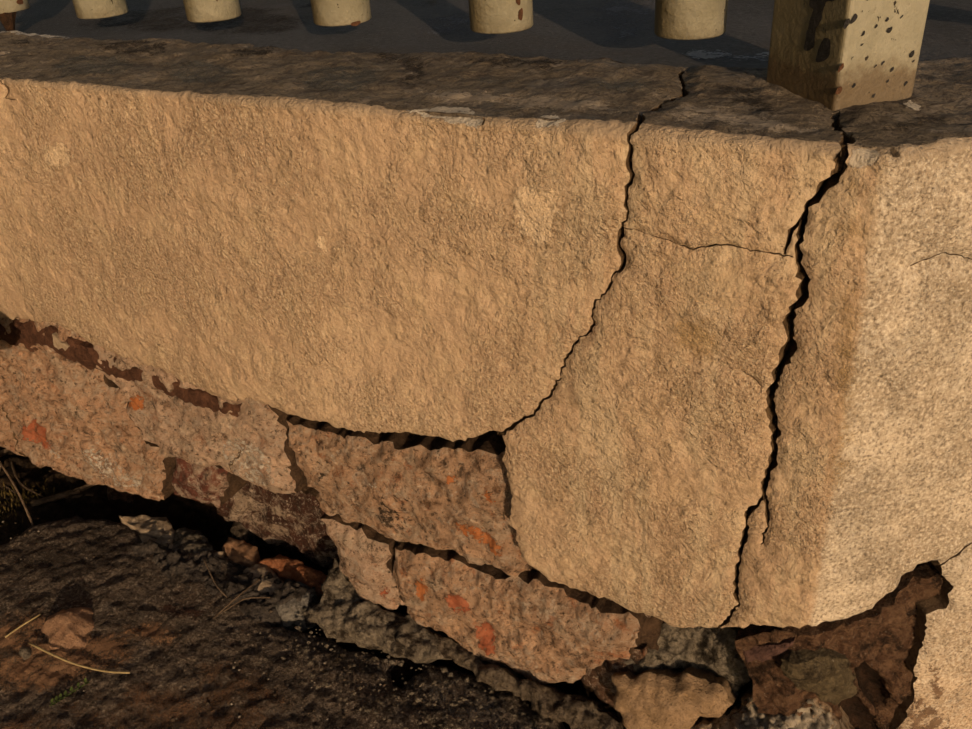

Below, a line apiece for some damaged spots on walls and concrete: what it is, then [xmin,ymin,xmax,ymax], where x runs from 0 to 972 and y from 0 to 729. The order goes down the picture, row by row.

crack [497,72,689,435]
flaking render [0,319,242,417]
crack [656,115,855,630]
spalling [455,523,503,557]
flaking render [735,561,944,729]